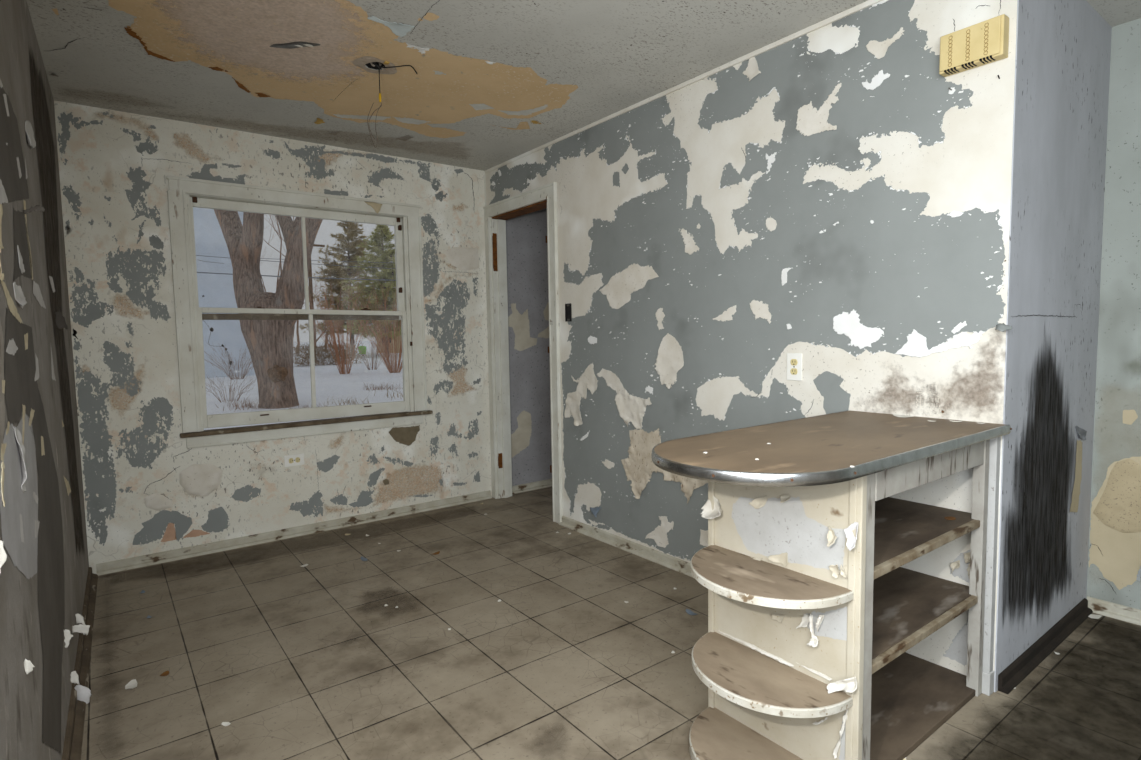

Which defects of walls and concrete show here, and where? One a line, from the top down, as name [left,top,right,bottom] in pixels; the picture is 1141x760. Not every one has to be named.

peeling [108,0,578,214]
peeling [0,80,174,753]
peeling [132,485,261,545]
peeling [289,214,482,517]
peeling [489,0,1012,583]
water stain [935,363,996,406]
water stain [1003,349,1074,620]
peeling [1070,425,1141,590]
peeling [720,631,832,681]
peeling [796,607,847,647]
peeling [833,709,848,760]